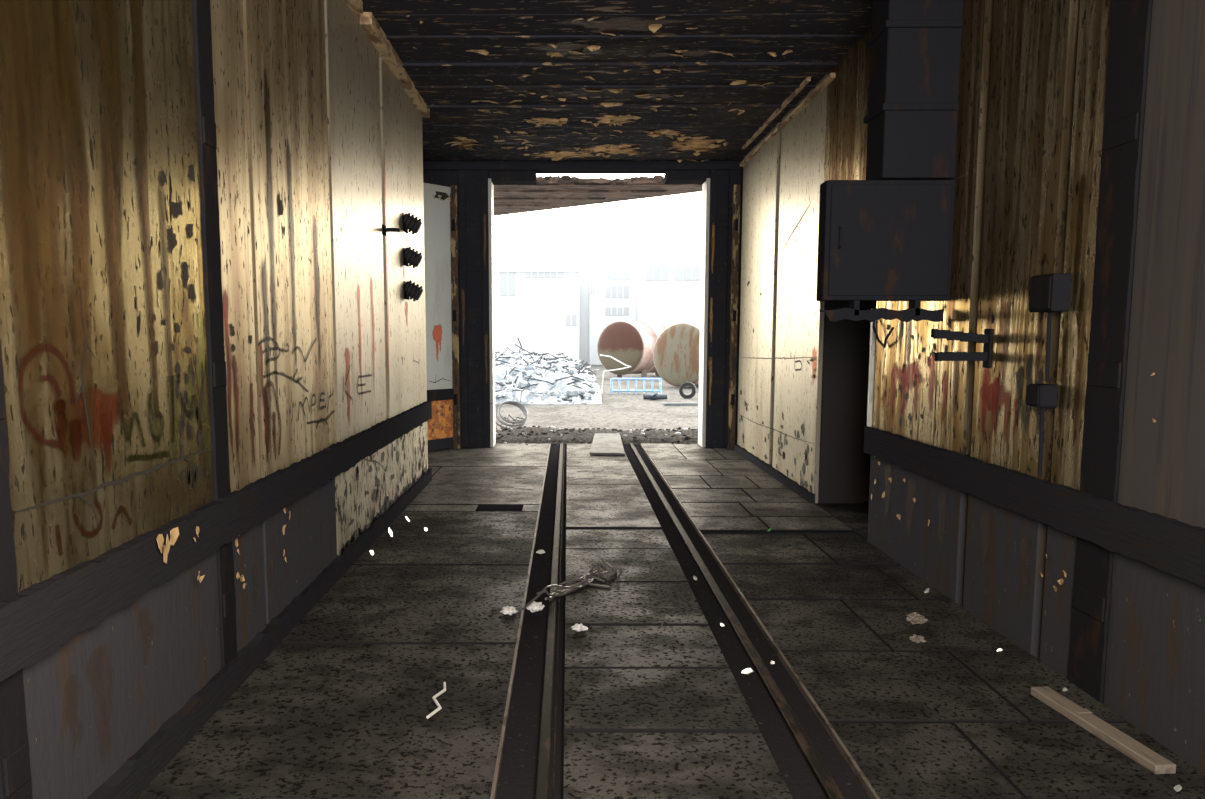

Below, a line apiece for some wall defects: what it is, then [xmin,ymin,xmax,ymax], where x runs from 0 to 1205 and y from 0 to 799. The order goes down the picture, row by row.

peeling [446,136,478,150]
peeling [471,76,728,163]
peeling [520,16,704,77]
peeling [646,49,734,73]
peeling [724,80,773,115]
water stain [94,0,173,425]
water stain [0,0,95,513]
peeling [339,424,427,557]